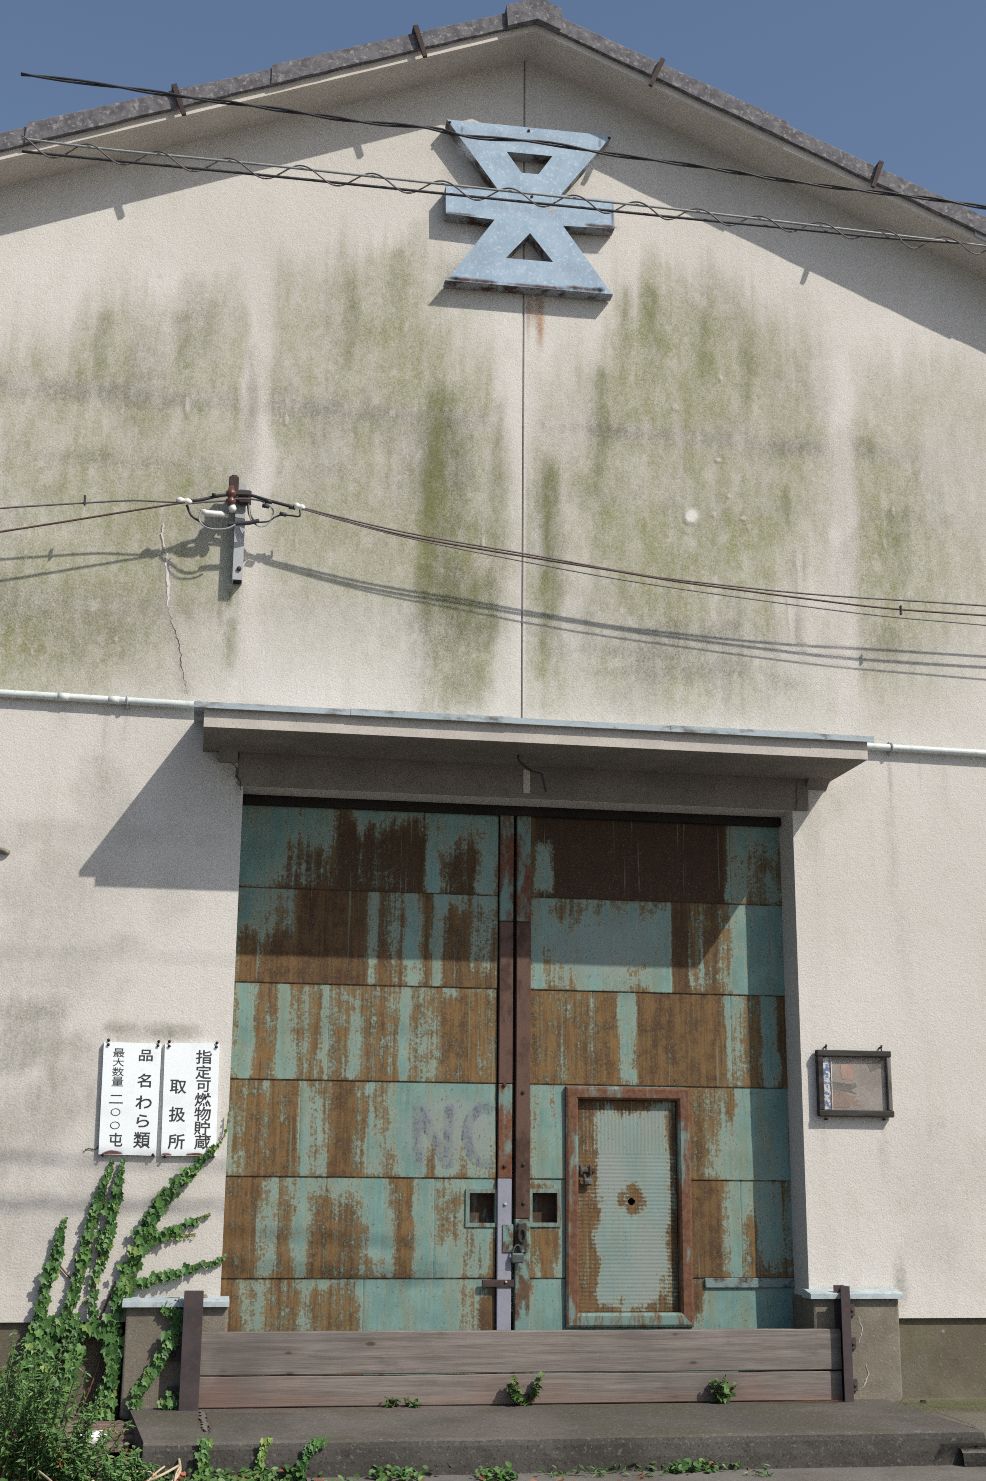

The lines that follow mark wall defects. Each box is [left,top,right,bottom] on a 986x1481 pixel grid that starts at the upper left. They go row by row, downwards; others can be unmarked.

rust [519,284,601,330]
crack [161,523,189,693]